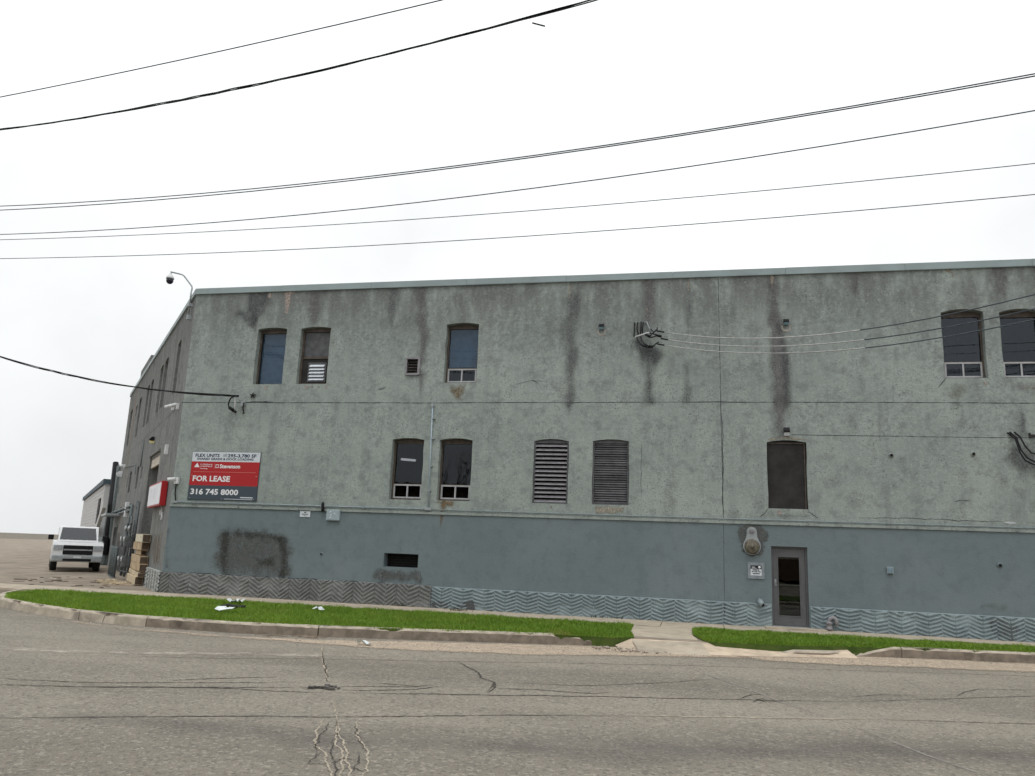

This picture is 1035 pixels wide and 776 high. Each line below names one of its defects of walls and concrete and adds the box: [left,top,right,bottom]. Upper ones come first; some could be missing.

leakage [239,293,267,328]
leakage [770,275,789,432]